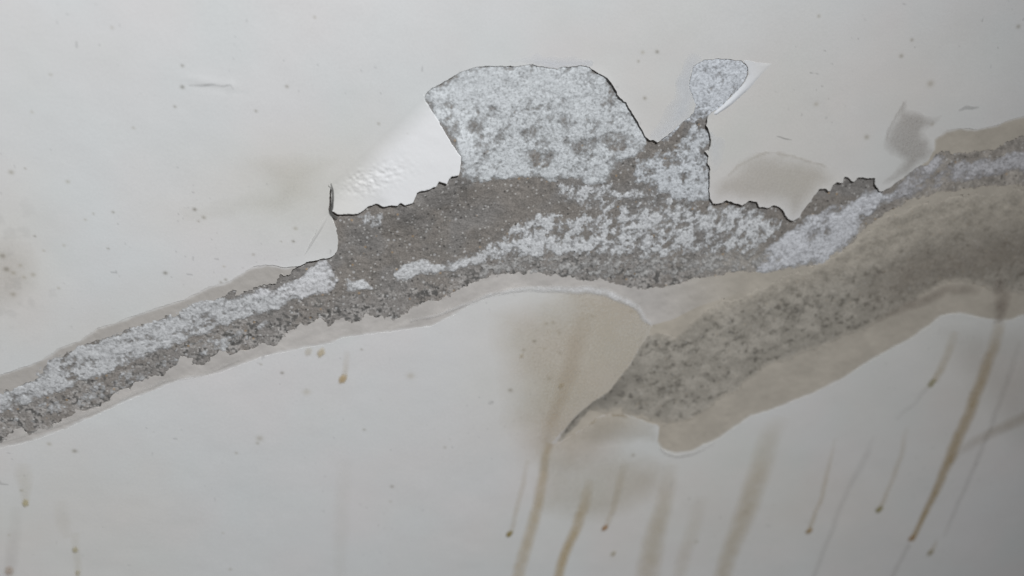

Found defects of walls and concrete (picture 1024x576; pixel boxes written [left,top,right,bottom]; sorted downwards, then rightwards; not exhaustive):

peeling [0,59,1024,456]